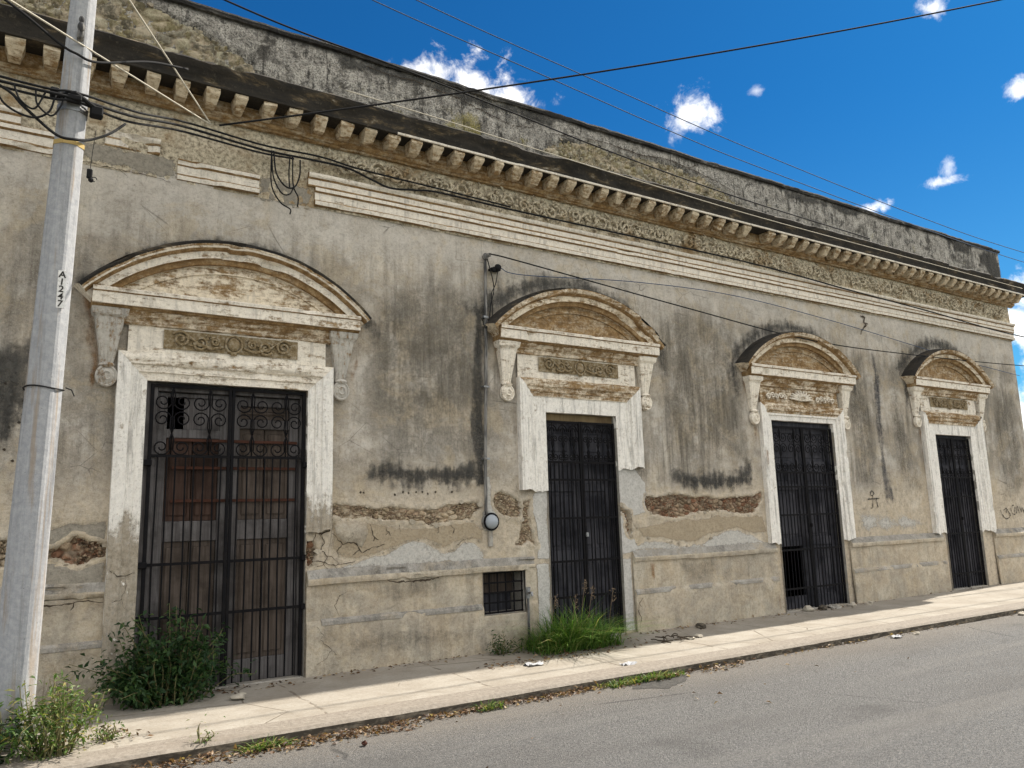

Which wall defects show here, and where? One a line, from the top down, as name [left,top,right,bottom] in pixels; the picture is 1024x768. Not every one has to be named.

water stain [0,344,30,440]
water stain [368,278,639,489]
peeling [45,511,139,705]
crack [313,513,400,664]
peeling [304,477,551,639]
spalling [618,469,776,631]
water stain [673,463,752,490]